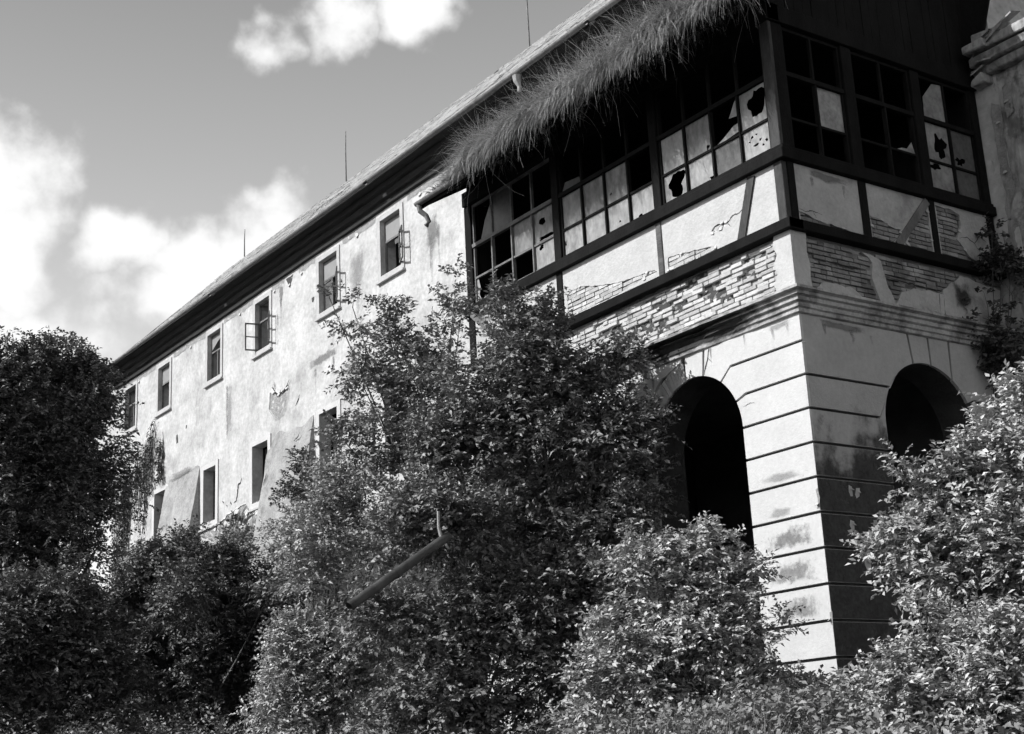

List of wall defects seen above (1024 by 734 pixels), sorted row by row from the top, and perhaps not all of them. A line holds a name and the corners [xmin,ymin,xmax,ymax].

flaking render [870,207,972,261]
flaking render [567,220,728,316]
spalling [742,251,766,280]
spalling [601,271,735,344]
water stain [775,530,808,548]
water stain [778,563,807,582]
water stain [784,598,812,616]